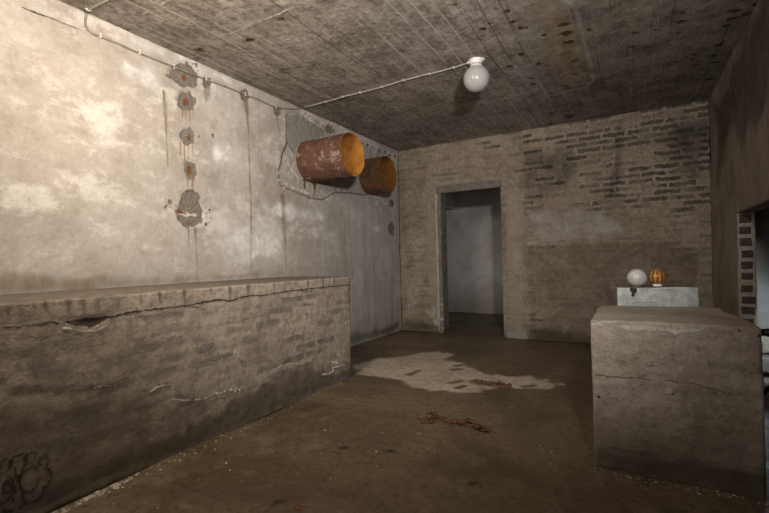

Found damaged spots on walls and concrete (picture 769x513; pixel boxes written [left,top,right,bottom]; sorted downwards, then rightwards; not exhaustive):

rust [533,0,594,91]
spalling [166,61,211,114]
spalling [164,127,212,228]
crack [101,284,350,319]
crack [3,320,61,328]
spalling [63,317,109,332]
crack [597,365,732,396]